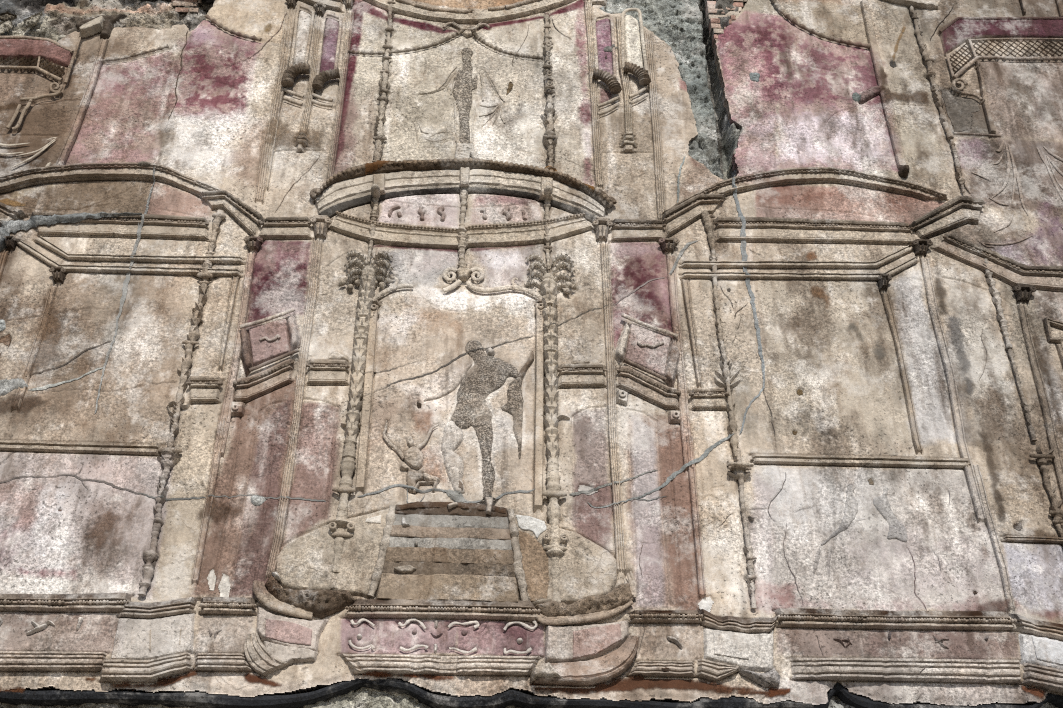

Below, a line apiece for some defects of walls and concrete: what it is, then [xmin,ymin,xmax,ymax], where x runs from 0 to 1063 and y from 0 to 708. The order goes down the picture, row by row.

crack [0,168,177,413]
crack [569,178,775,508]
water stain [811,286,829,303]
crack [0,452,326,502]
crack [358,484,536,503]
crack [717,471,811,605]